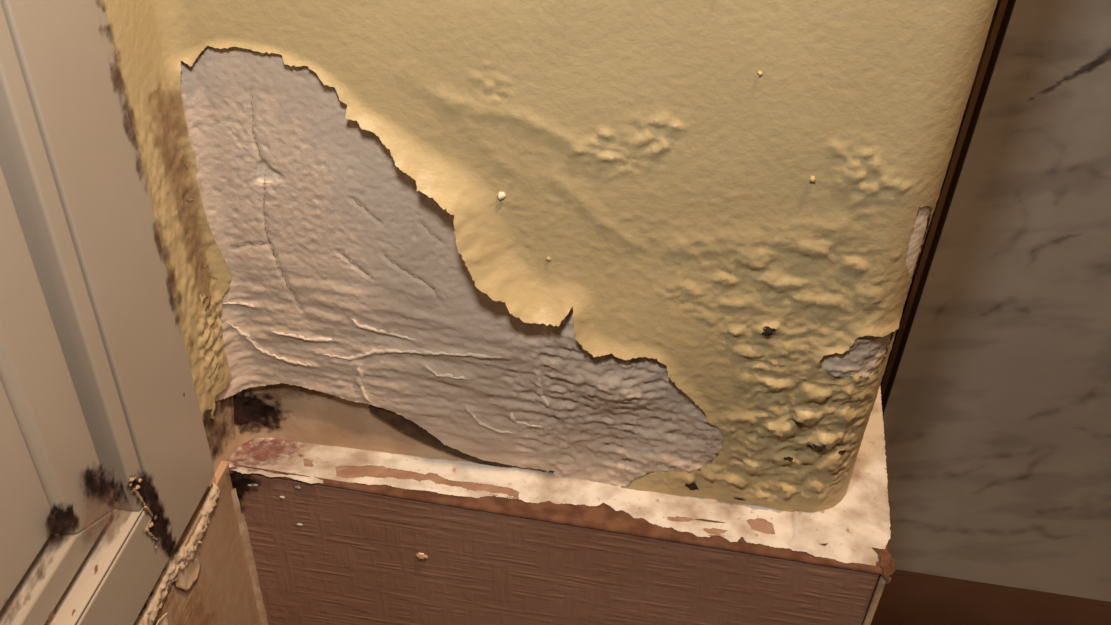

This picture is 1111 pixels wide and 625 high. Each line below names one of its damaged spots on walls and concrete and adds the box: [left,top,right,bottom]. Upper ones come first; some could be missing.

peeling [153,16,742,487]
damp [203,383,327,510]
mould [46,504,79,536]
mould [84,465,180,555]
spalling [876,550,897,585]